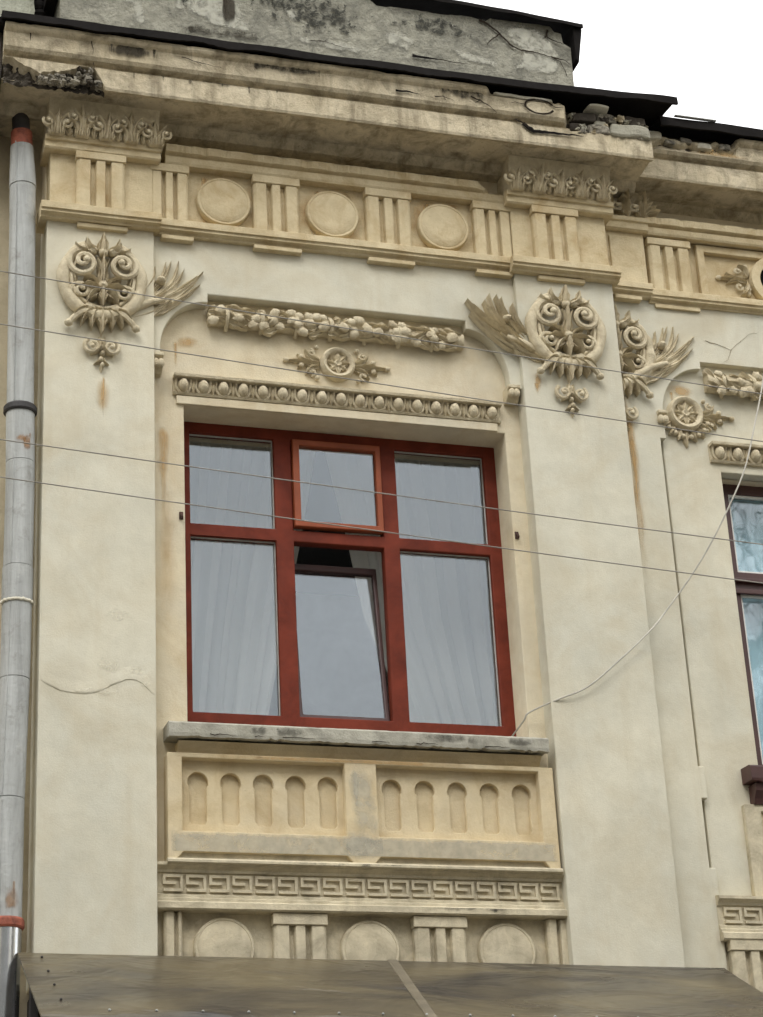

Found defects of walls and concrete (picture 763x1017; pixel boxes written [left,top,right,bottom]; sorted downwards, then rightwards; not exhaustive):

leakage [188,0,257,40]
crack [479,19,568,76]
spalling [3,63,104,98]
spalling [492,92,552,104]
spalling [515,104,731,154]
rust [627,422,638,500]